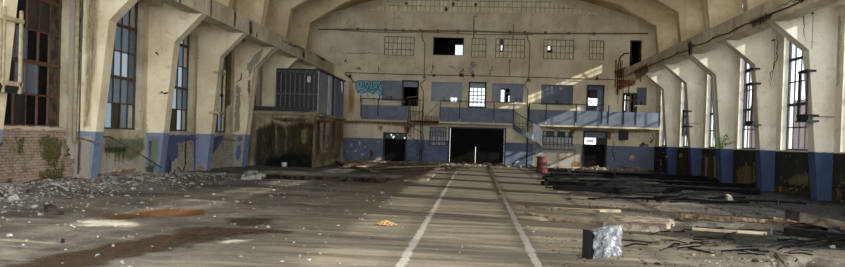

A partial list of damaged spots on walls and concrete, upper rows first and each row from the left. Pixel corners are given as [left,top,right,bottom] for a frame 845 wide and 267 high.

spalling [0,128,154,184]
peeling [165,84,249,172]